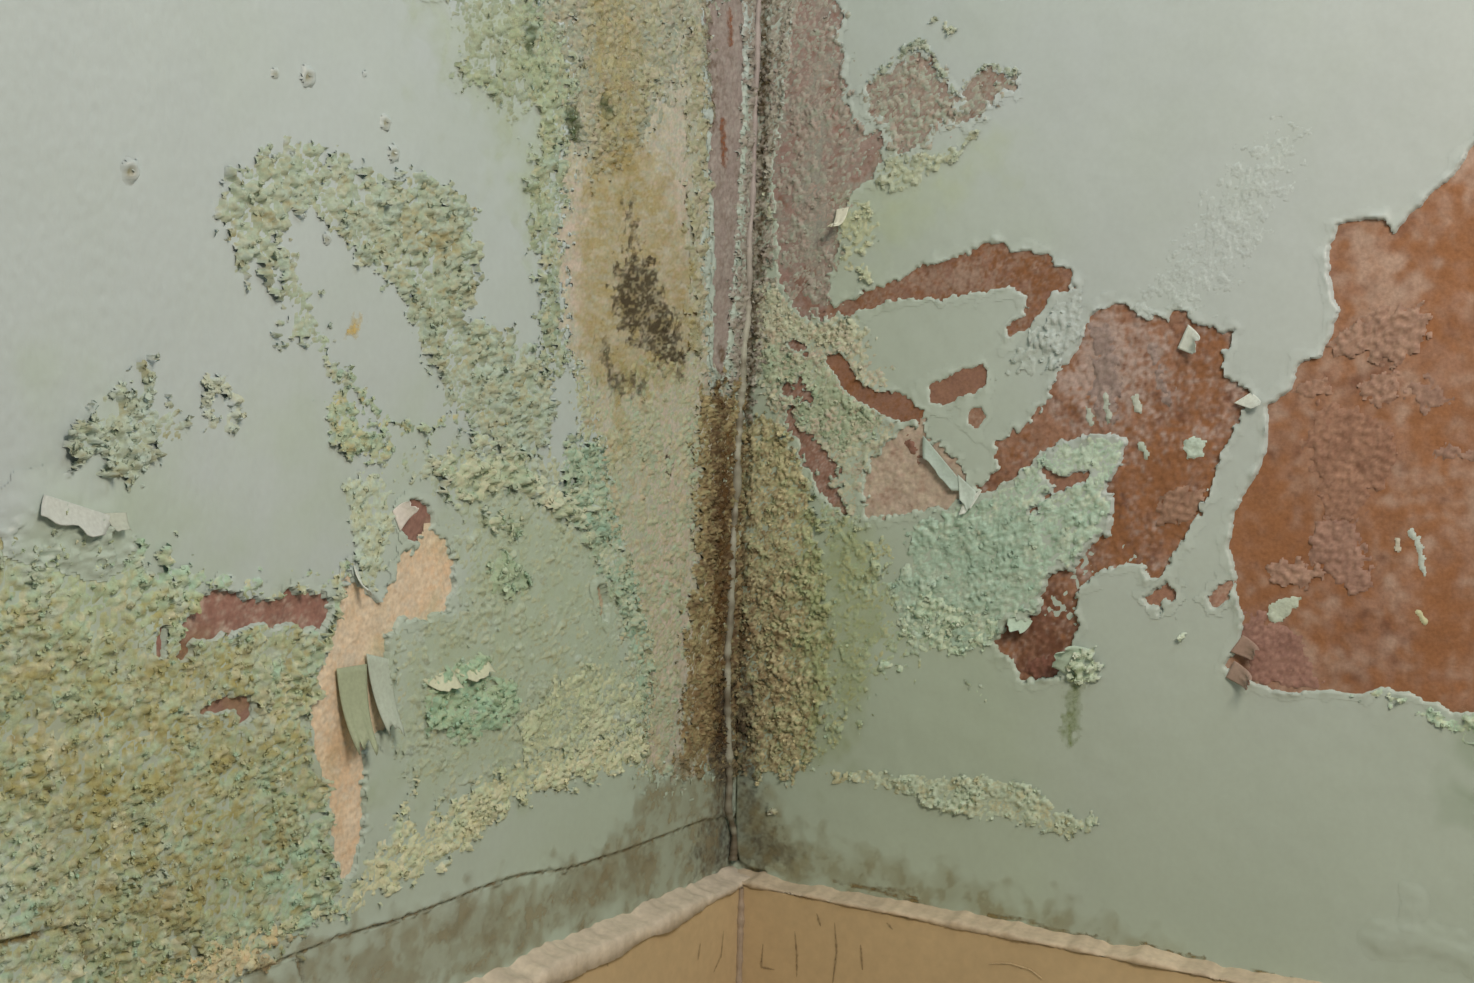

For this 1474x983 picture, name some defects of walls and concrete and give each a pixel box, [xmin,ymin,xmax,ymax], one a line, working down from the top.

leakage [567,111,584,142]
leakage [606,202,691,377]
leakage [697,0,771,872]
peeling [550,0,1474,801]
peeling [139,490,464,898]